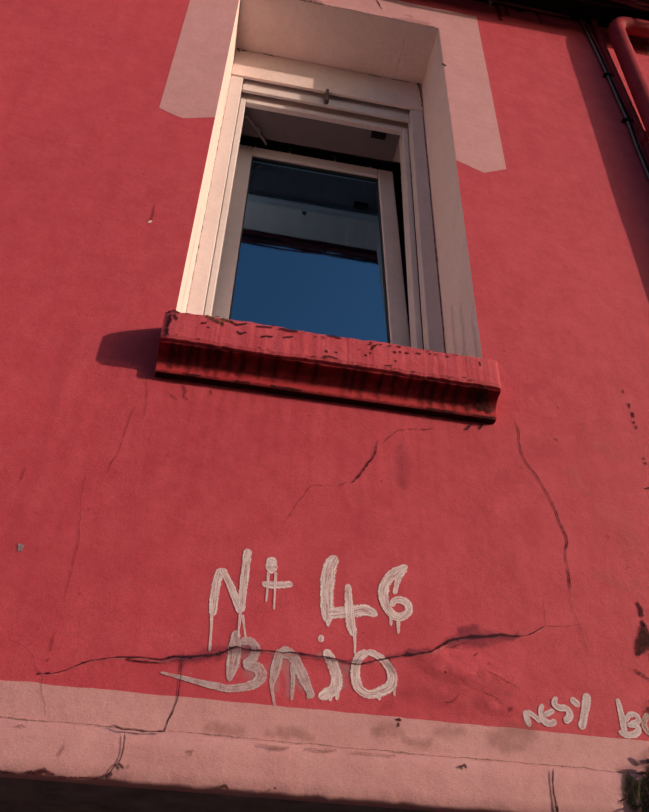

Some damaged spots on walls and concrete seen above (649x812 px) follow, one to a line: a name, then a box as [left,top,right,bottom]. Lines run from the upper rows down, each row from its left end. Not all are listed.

peeling [257,325,348,348]
crack [341,438,388,485]
crack [513,419,571,585]
leakage [635,602,649,656]
crack [0,626,544,778]
crack [187,732,648,812]